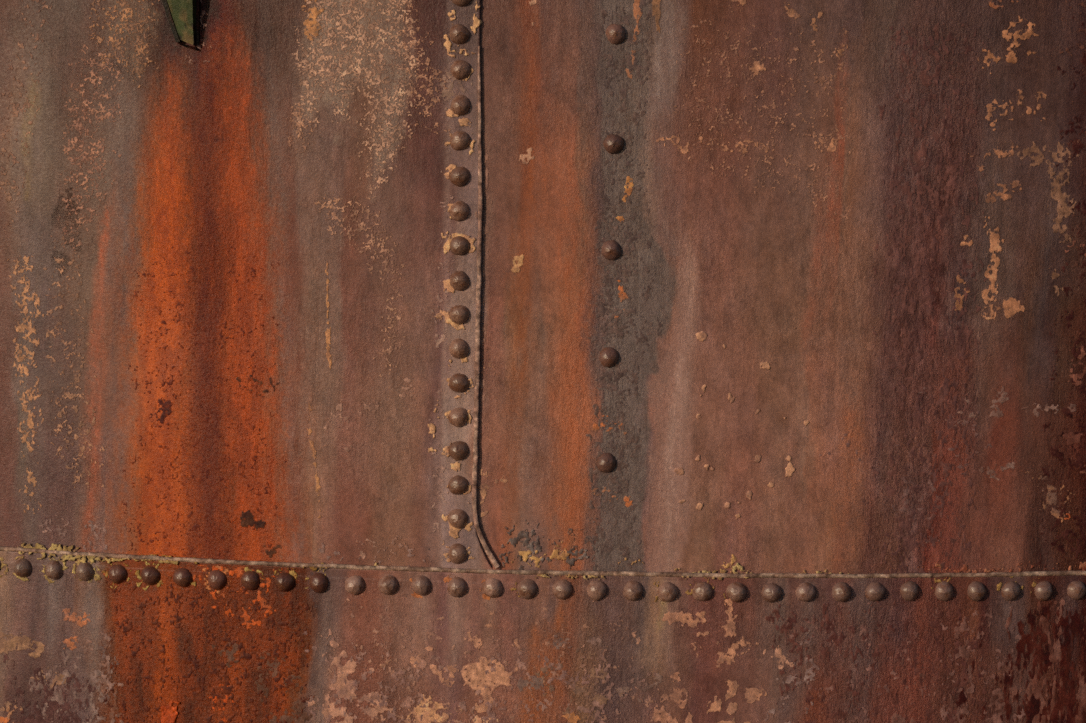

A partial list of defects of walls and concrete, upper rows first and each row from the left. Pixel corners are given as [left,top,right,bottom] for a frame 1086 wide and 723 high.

peeling [7,0,287,561]
corrosion [92,0,321,723]
peeling [286,0,508,566]
corrosion [479,0,610,723]
peeling [954,216,1025,321]
peeling [977,0,1039,74]
peeling [985,89,1047,131]
peeling [968,141,1086,256]
corrosion [822,368,879,562]
corrosion [868,309,1086,723]
peeling [653,597,1086,723]